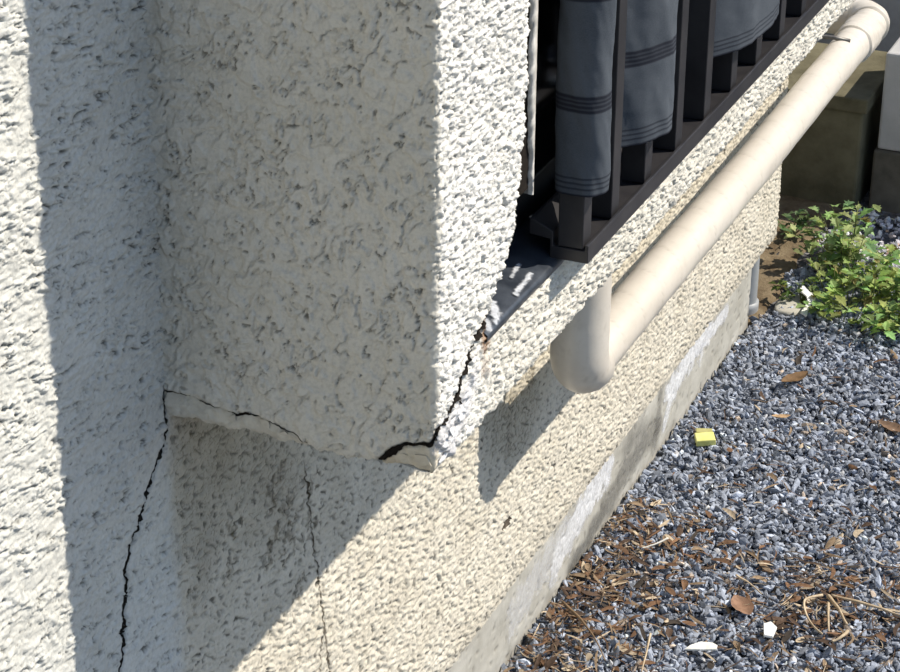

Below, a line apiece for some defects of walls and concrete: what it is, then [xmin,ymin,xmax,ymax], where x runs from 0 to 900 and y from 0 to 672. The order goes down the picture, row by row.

crack [378,315,487,460]
crack [118,390,307,672]
crack [304,470,331,672]